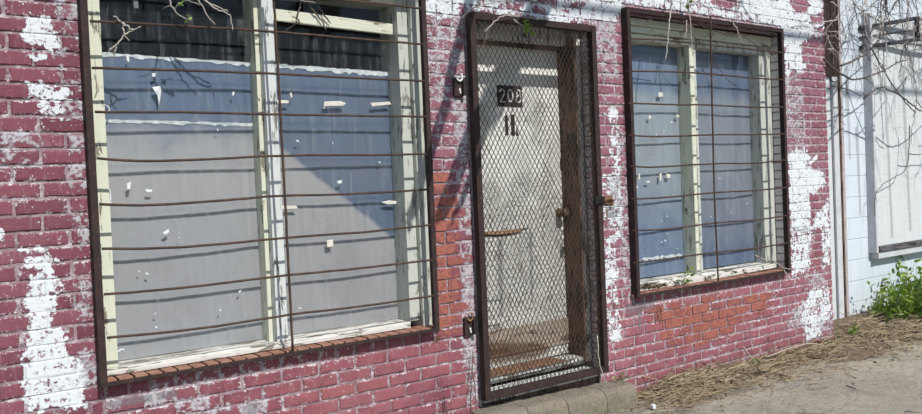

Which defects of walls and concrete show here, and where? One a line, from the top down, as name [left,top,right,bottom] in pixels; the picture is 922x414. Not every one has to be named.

peeling [20,0,83,121]
peeling [0,130,43,172]
peeling [63,133,87,189]
peeling [426,0,833,405]
peeling [71,211,89,251]
peeling [14,245,97,414]
peeling [106,398,122,410]